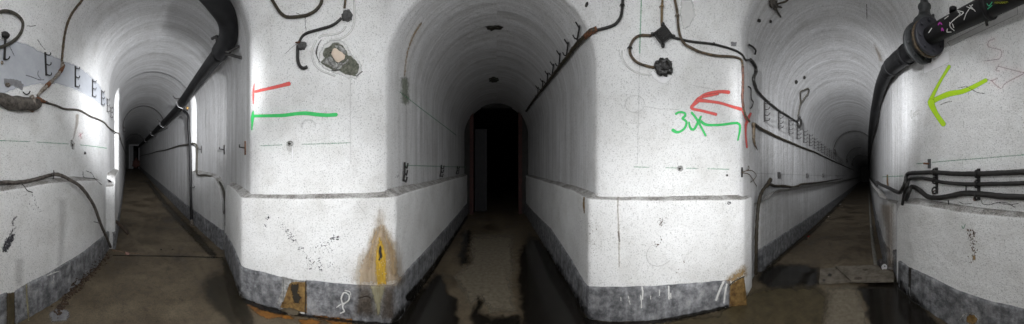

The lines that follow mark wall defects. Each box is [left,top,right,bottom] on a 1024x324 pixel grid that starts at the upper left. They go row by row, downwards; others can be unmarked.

spalling [315,40,363,79]
rust [247,223,400,324]